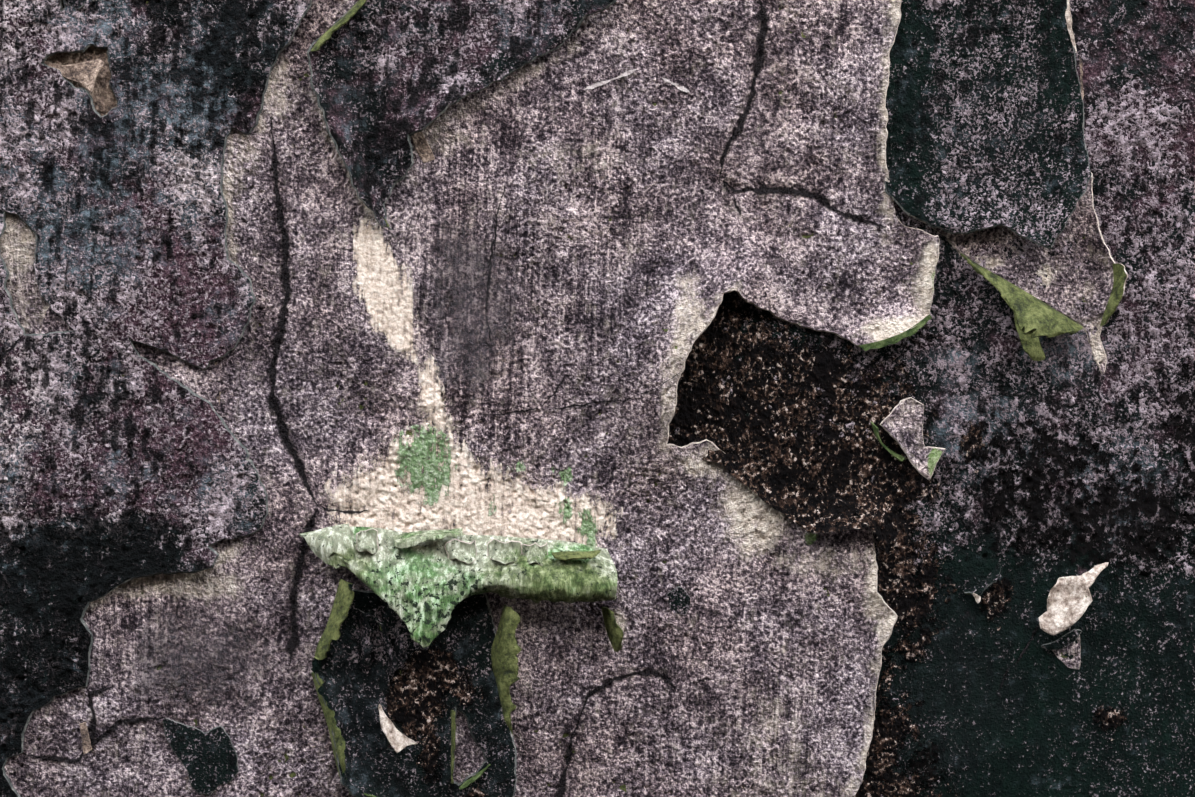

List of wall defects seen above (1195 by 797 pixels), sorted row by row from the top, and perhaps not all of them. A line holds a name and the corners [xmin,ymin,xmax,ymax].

crack [720,0,886,228]
flaking render [933,172,1128,375]
flaking render [0,0,945,797]
peeling [963,564,1001,603]
peeling [1038,562,1109,669]